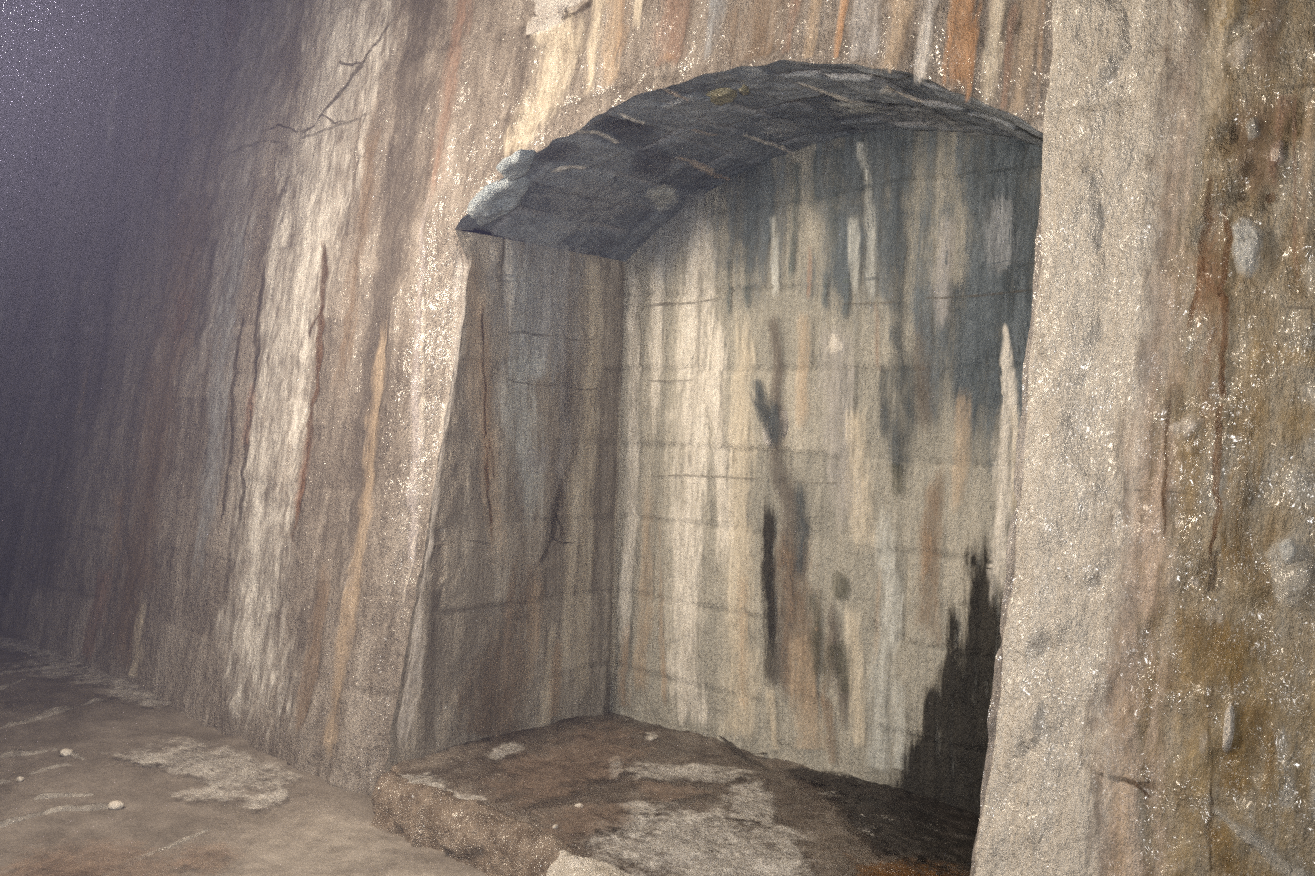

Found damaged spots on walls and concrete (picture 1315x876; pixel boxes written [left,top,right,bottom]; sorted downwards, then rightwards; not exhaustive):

crack [270,23,390,132]
damp [753,319,846,708]
damp [784,0,1194,876]